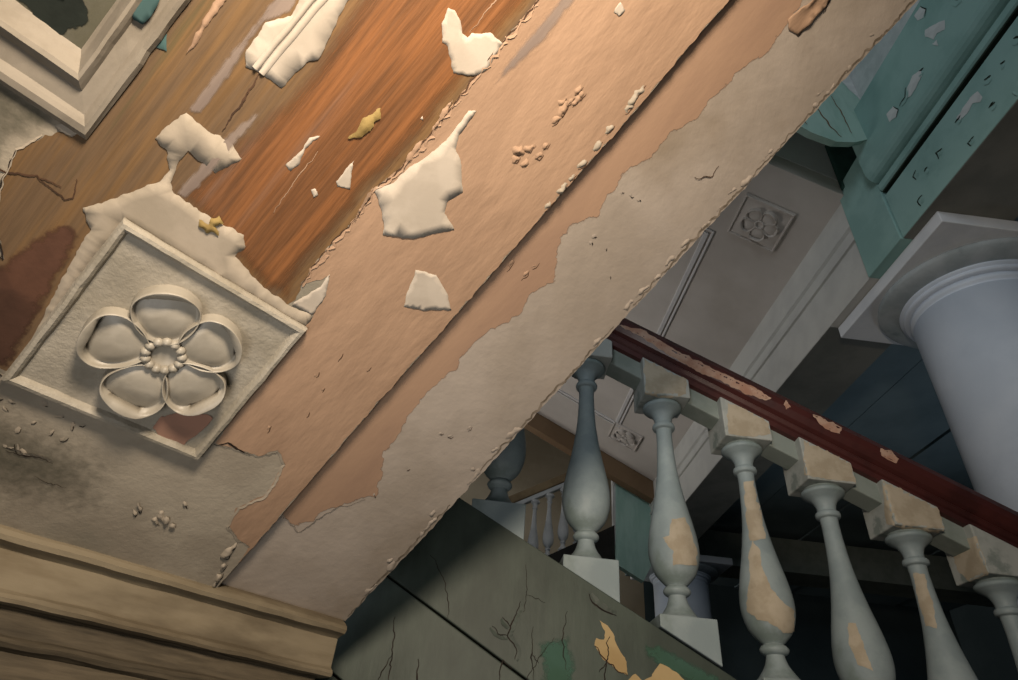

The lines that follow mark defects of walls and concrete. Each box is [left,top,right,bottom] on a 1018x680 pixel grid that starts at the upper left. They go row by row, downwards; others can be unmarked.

peeling [914,6,945,46]
crack [805,96,852,137]
crack [0,169,77,200]
peeling [0,0,830,587]
peeling [813,414,842,434]
peeling [803,440,856,483]
peeling [880,448,899,463]
peeling [882,481,944,533]
peeling [743,480,795,633]
peeling [954,536,989,581]
crack [589,593,617,680]
peeling [595,621,684,680]